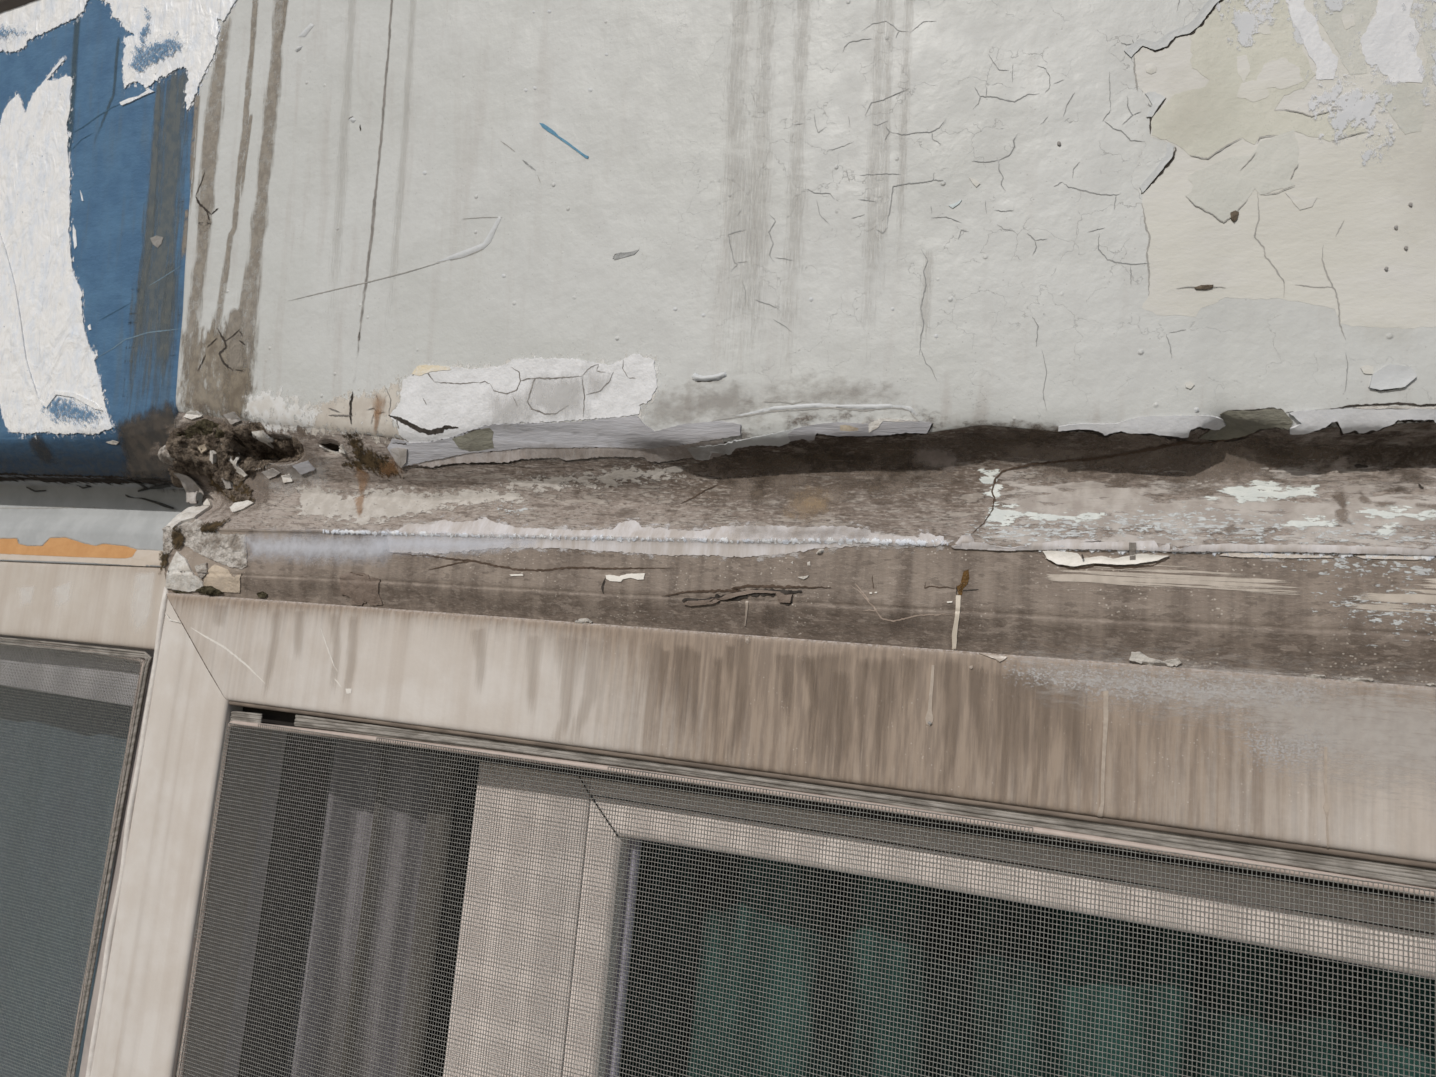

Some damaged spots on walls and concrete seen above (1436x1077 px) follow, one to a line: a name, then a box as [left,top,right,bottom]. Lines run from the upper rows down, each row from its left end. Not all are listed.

crack [844,21,931,48]
crack [1103,39,1152,142]
peeling [150,236,164,248]
damp [128,0,287,425]
crack [794,55,1073,256]
crack [1055,164,1150,283]
peeling [1124,0,1436,329]
crack [919,249,936,378]
crack [1032,317,1047,411]
peeling [0,351,1436,594]
damp [682,423,1436,513]